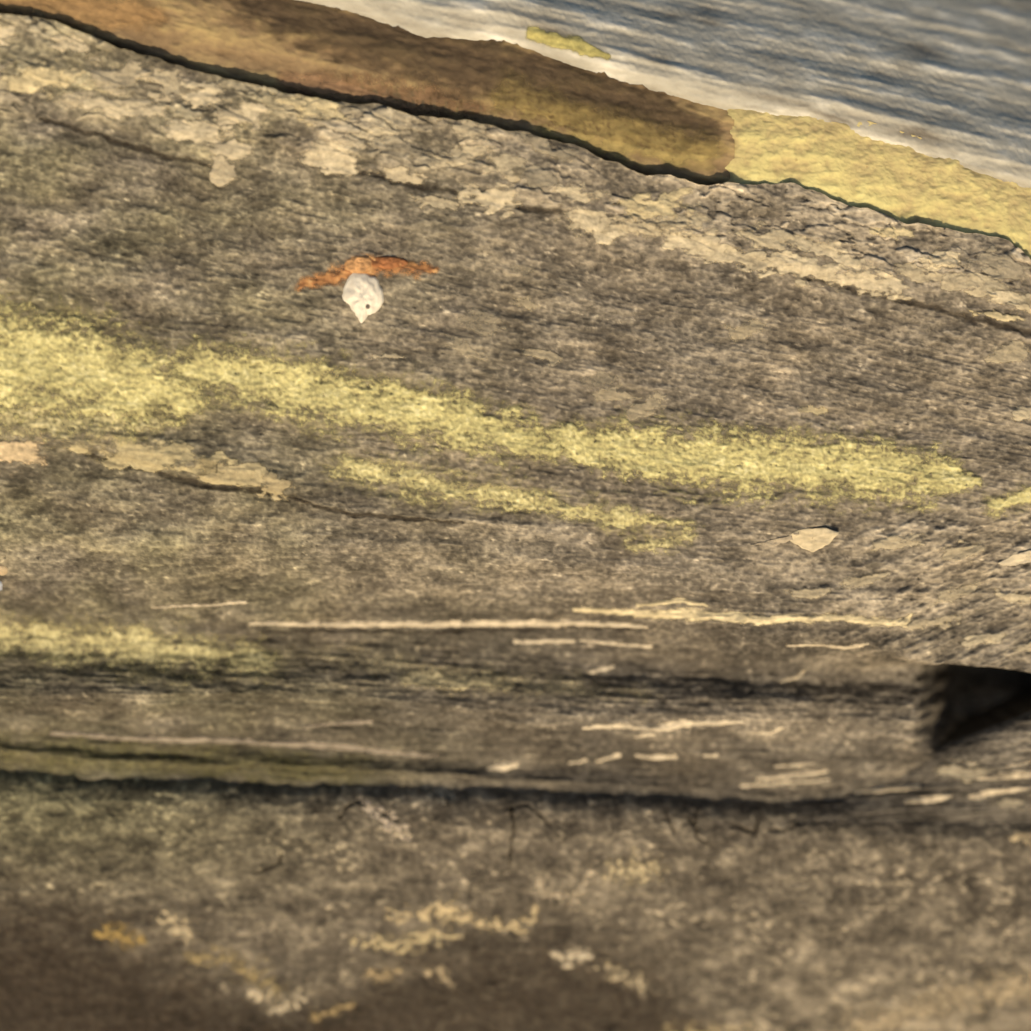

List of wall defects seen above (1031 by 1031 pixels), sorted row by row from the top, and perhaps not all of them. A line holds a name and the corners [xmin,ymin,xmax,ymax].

rust [296,256,438,291]